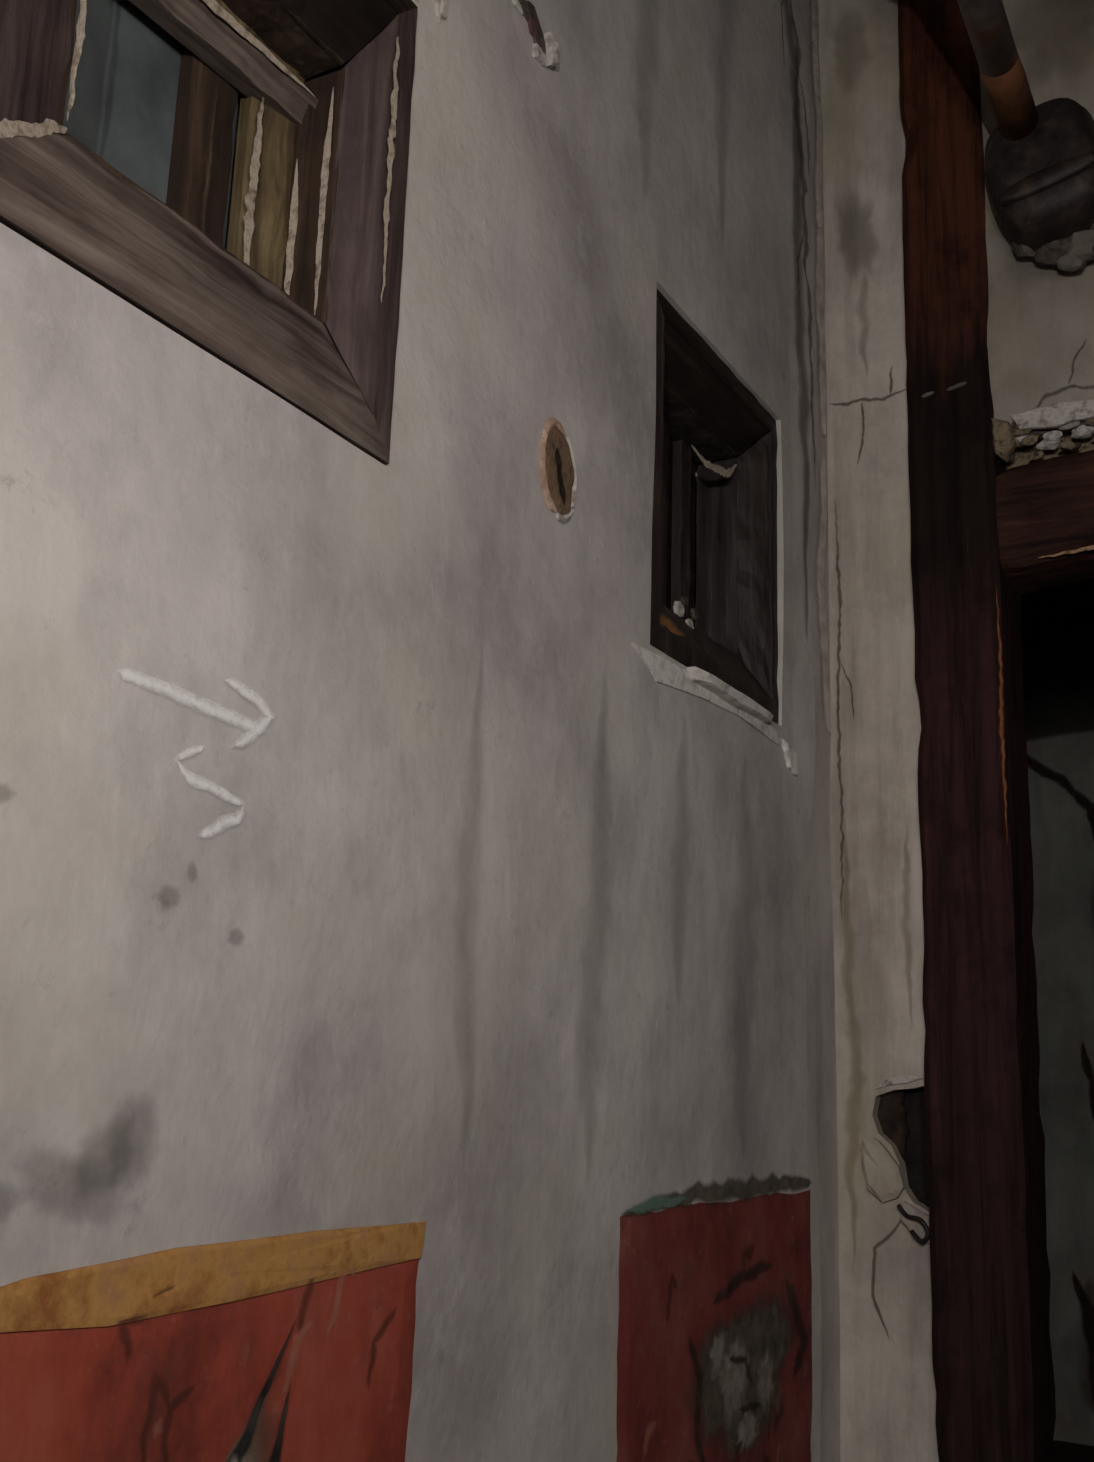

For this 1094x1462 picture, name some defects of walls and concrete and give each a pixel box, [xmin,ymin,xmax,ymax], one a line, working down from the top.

spalling [512,0,559,68]
spalling [539,417,577,524]
spalling [991,399,1094,463]
crack [1027,755,1094,837]
crack [1081,1041,1094,1119]
spalling [861,1075,930,1334]
crack [1073,1273,1094,1400]